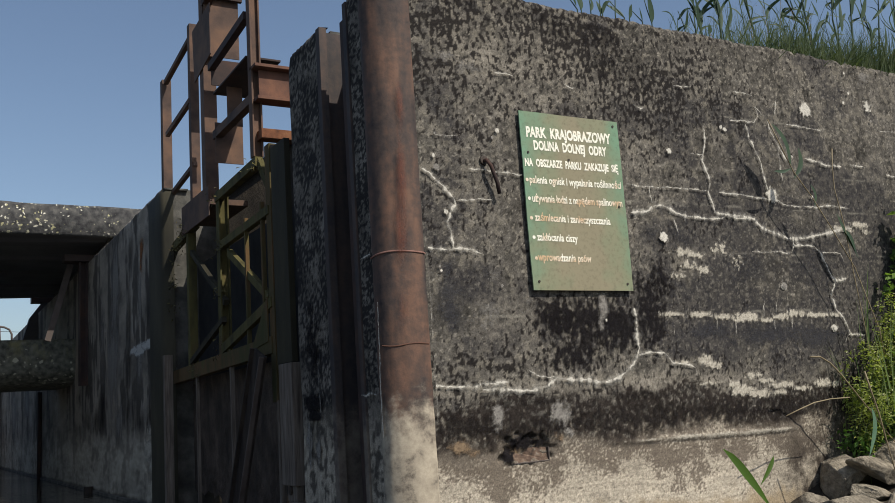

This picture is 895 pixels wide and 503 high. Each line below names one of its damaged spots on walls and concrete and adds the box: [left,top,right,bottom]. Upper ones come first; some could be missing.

crack [421,167,490,286]
crack [631,91,863,340]
crack [435,308,696,416]
water stain [439,372,839,443]